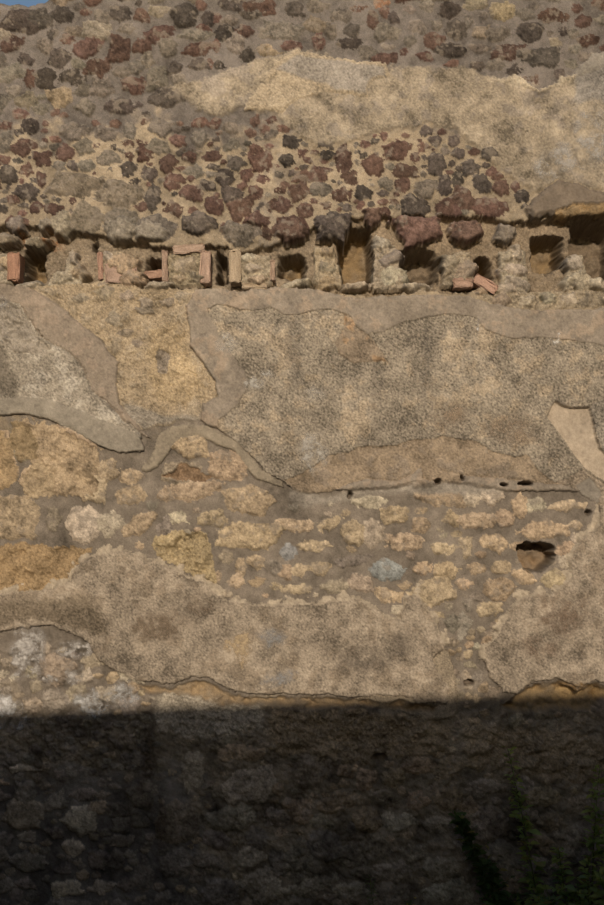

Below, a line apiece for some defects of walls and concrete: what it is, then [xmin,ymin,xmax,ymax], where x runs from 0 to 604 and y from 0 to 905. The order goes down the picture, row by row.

spalling [0,104,528,231]
spalling [38,283,218,431]
flaking render [548,402,604,481]
spalling [0,414,604,905]